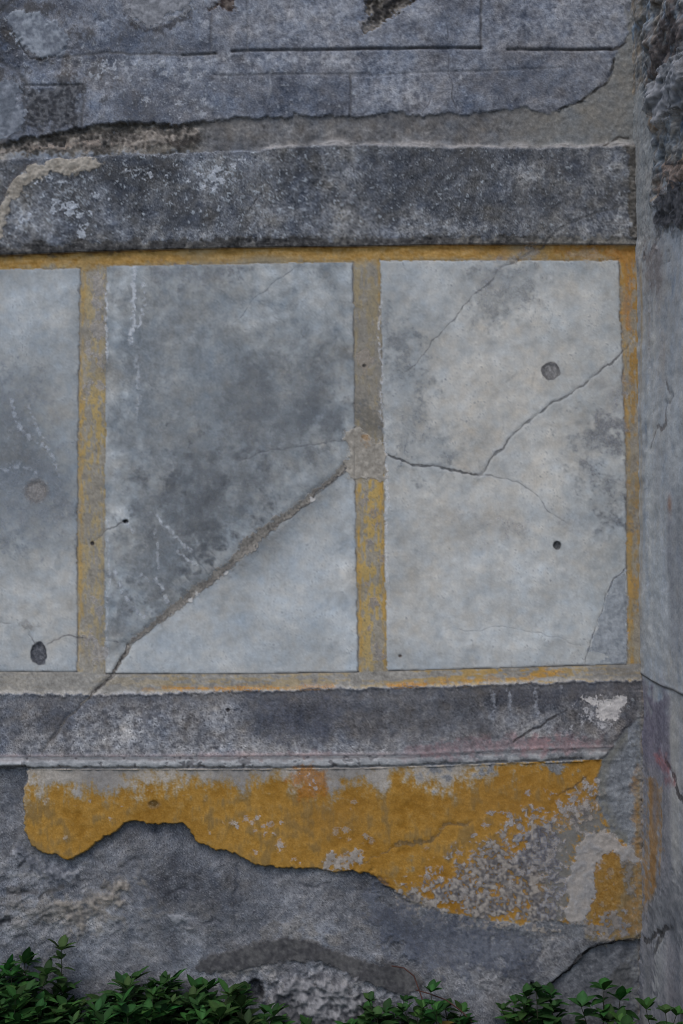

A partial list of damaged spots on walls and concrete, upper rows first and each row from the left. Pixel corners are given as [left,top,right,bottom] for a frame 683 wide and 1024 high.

spalling [644,0,683,85]
spalling [0,79,201,156]
spalling [652,160,683,233]
crack [388,442,507,475]
crack [60,460,348,729]
crack [513,710,566,742]
spalling [570,694,627,730]
spalling [0,768,640,1024]